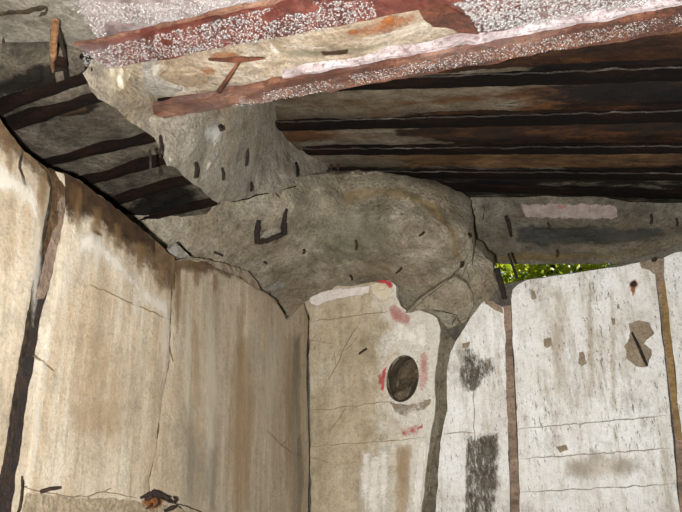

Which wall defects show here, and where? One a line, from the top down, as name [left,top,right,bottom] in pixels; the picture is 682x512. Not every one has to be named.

rust [349,17,413,35]
spalling [42,168,65,254]
water stain [63,172,242,317]
spalling [83,57,507,329]
crack [415,239,474,308]
crack [3,151,135,512]
crack [91,285,174,383]
water stain [460,348,494,391]
spalling [624,320,654,367]
water stain [465,435,498,512]